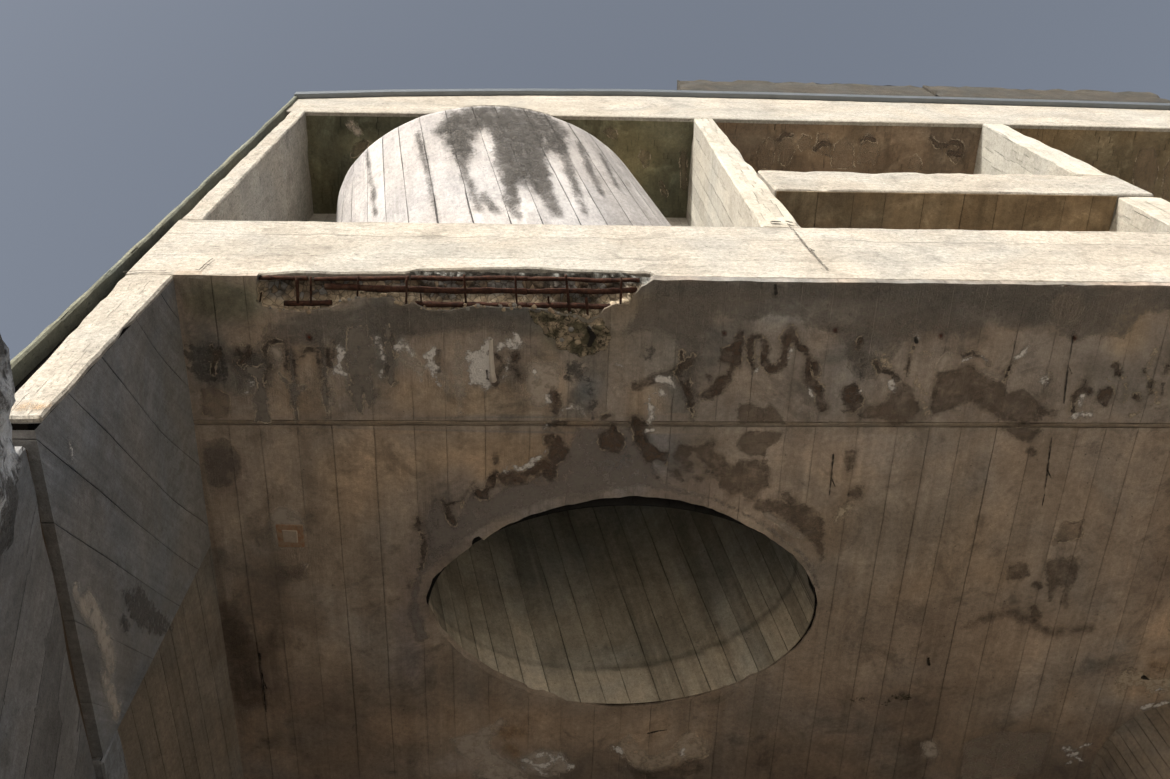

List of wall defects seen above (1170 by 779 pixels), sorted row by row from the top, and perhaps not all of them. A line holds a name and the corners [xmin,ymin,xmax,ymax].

water stain [348,121,376,215]
water stain [434,105,617,216]
spalling [256,271,651,357]
water stain [183,282,1170,641]
water stain [73,586,119,716]